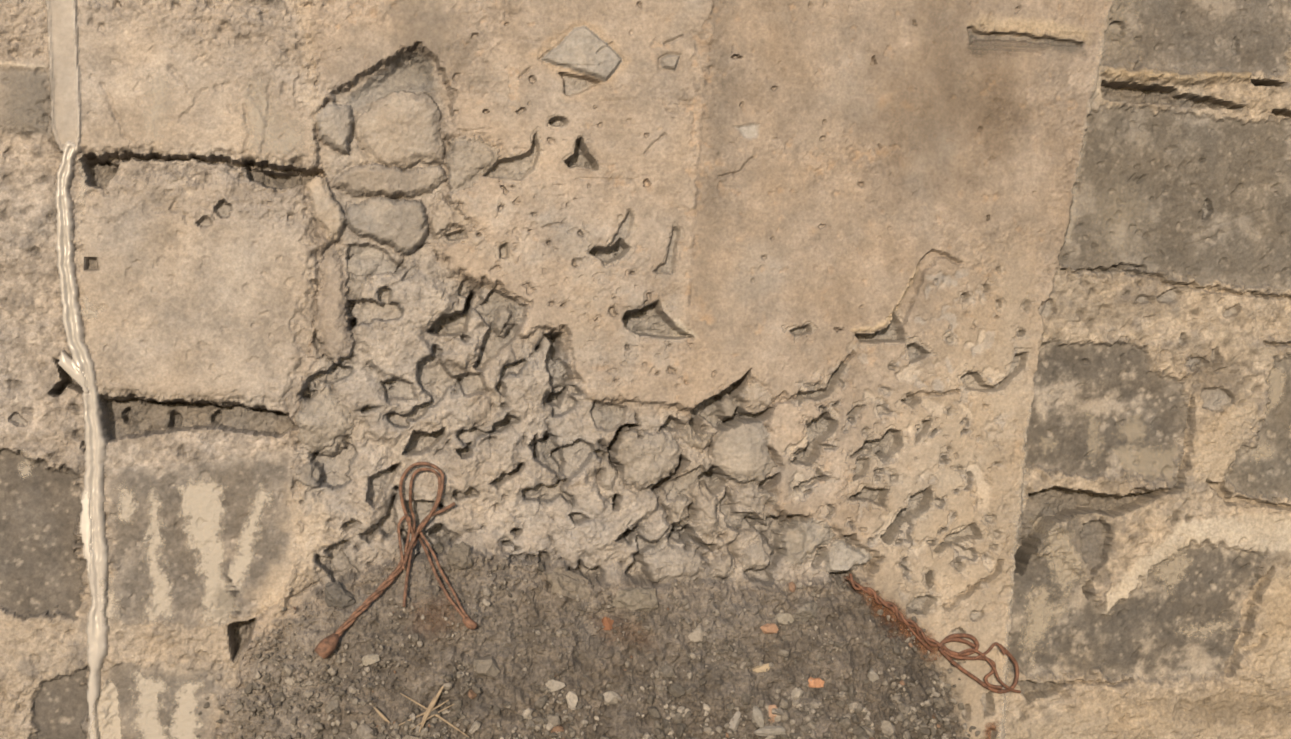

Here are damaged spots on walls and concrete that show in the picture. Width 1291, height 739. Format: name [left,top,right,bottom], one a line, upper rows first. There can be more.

crack [46,0,327,739]
spalling [534,23,631,98]
spalling [284,44,1031,622]
crack [1017,678,1137,707]